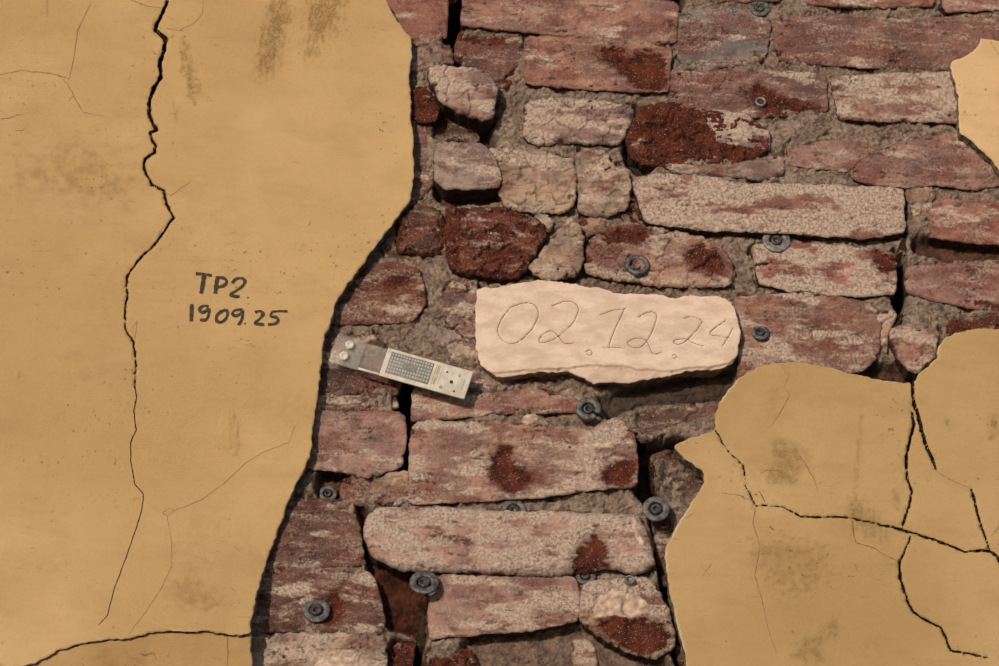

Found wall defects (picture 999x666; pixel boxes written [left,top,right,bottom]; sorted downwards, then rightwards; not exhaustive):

crack [0,5,100,116]
crack [41,0,296,663]
crack [714,376,999,658]